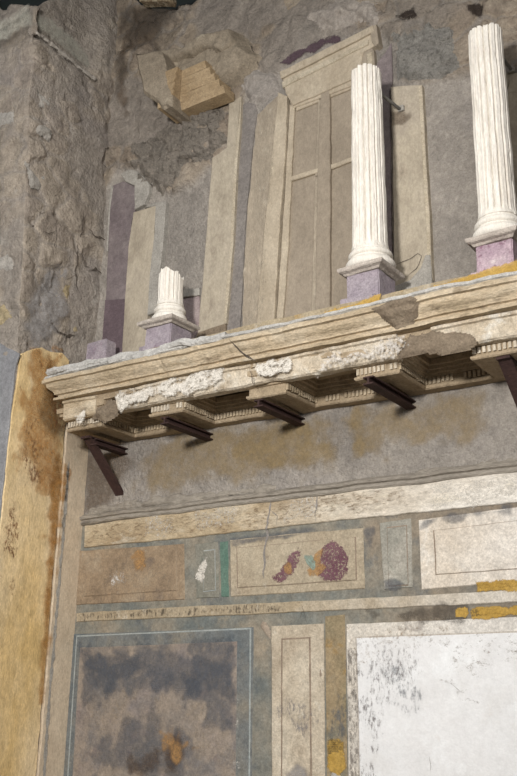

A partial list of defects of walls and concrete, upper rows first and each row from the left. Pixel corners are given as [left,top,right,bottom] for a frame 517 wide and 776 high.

peeling [115,368,224,412]
peeling [255,357,292,376]
leakage [45,459,61,615]
crack [262,502,277,578]